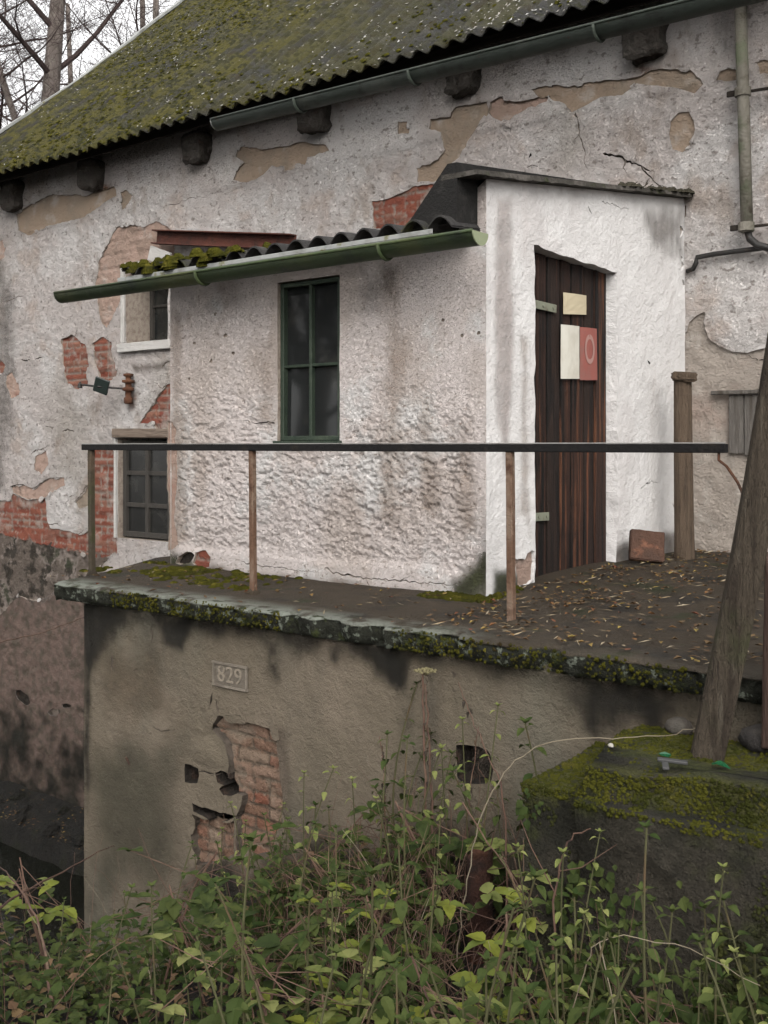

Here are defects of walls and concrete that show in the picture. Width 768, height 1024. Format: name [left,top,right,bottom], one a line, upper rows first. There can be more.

peeling [372,66,703,229]
crack [576,115,660,186]
spalling [18,187,132,235]
spalling [96,221,175,285]
spalling [62,296,120,389]
peeling [141,384,211,568]
spalling [684,311,765,553]
spalling [0,450,117,614]
leakage [158,616,254,649]
leakage [387,660,406,688]
leakage [574,682,671,732]
spalling [187,712,286,868]